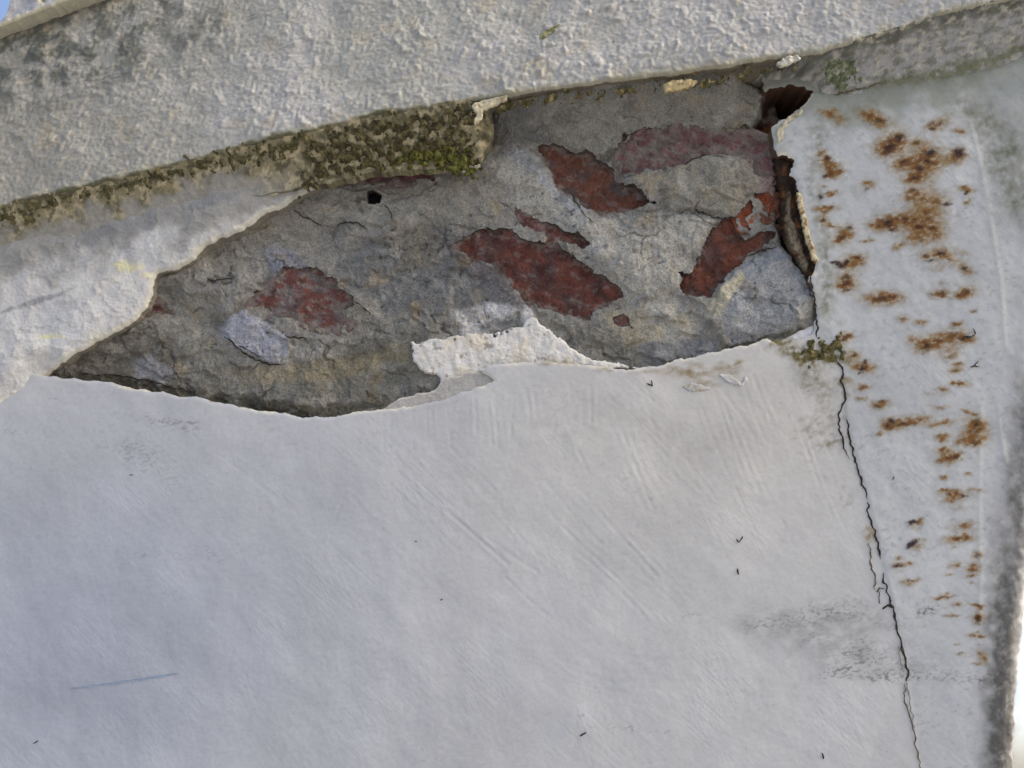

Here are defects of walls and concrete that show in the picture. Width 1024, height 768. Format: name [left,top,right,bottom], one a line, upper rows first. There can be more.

rust [816,110,973,274]
flaking render [51,73,818,418]
crack [810,275,819,337]
rust [830,255,864,291]
rust [865,291,903,304]
rust [932,288,973,300]
rust [909,322,975,391]
rust [847,353,988,503]
rust [948,523,971,541]
crack [837,362,921,768]
rust [949,552,982,584]
rust [936,593,983,621]